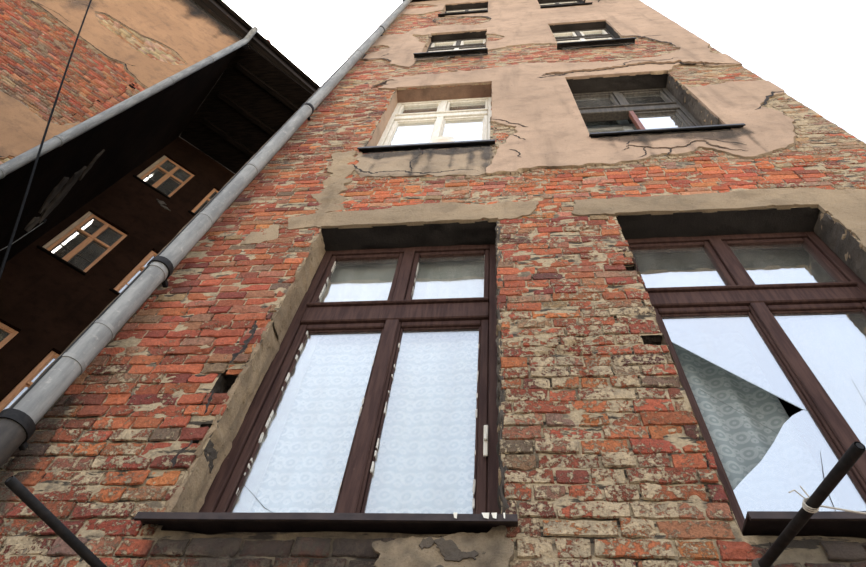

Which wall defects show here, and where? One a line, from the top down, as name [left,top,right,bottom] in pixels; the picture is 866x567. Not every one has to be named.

flaking render [0,0,147,125]
flaking render [95,11,187,65]
flaking render [365,4,681,82]
crack [539,35,739,78]
flaking render [651,63,766,126]
crack [492,118,528,157]
flaking render [485,92,866,176]
crack [622,139,748,157]
spalling [164,231,325,512]
spalling [372,221,514,567]